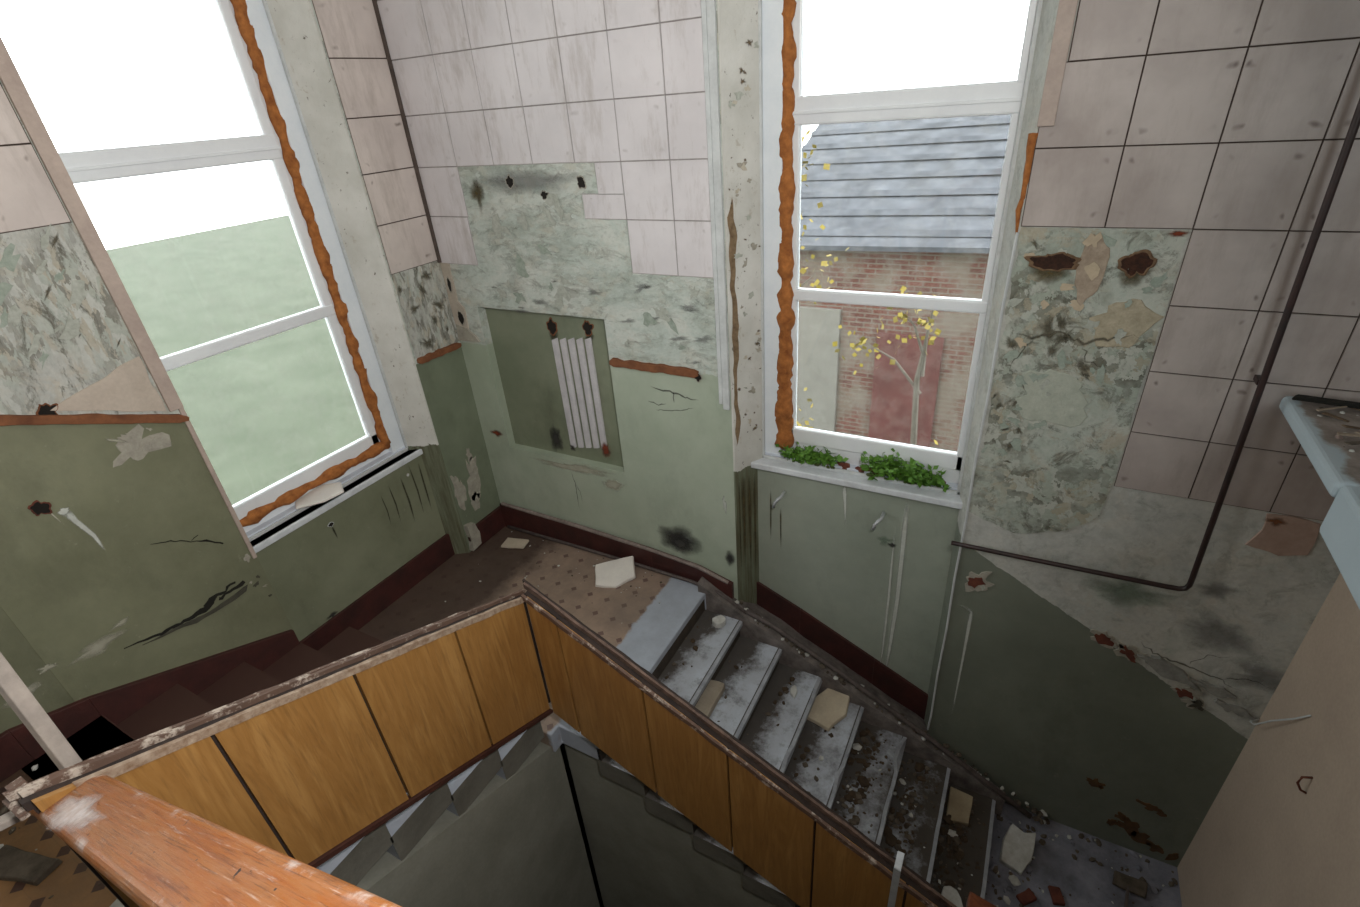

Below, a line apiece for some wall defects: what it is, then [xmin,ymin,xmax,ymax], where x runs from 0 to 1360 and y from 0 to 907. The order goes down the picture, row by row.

peeling [729,68,751,108]
flaking render [391,157,762,444]
peeling [0,223,172,467]
peeling [969,227,1189,534]
spalling [965,571,995,592]
crack [124,580,248,649]
spalling [1090,629,1148,663]
crack [1148,648,1256,684]
spalling [1106,812,1179,860]